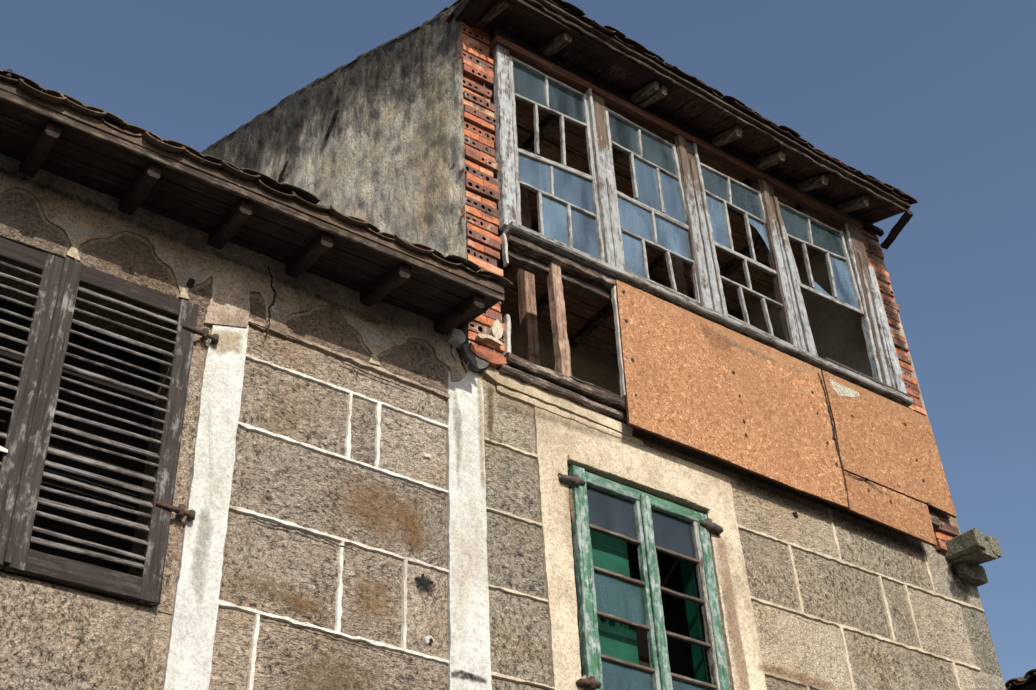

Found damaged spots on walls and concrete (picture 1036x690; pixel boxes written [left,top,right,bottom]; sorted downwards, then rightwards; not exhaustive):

crack [264,266,283,339]